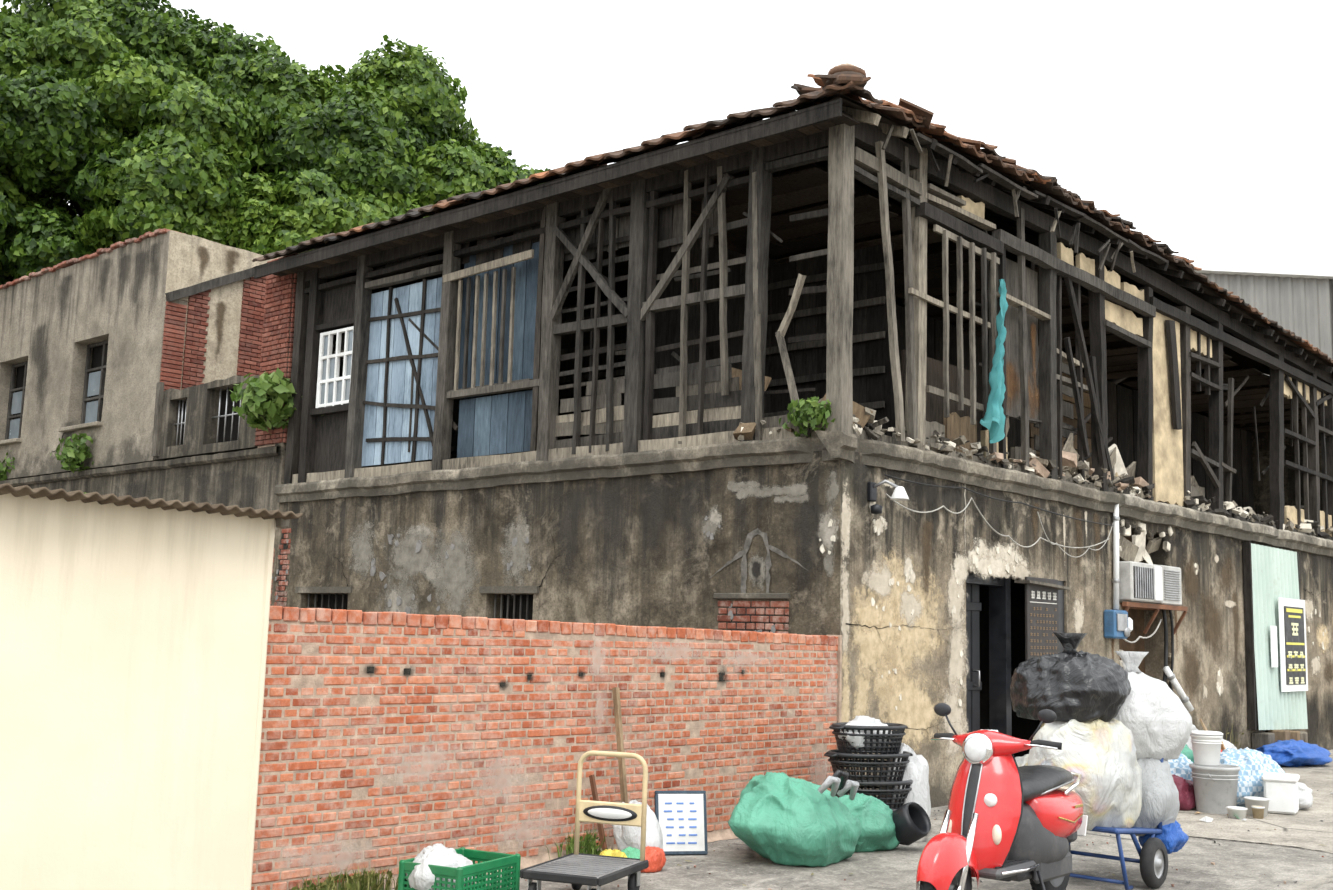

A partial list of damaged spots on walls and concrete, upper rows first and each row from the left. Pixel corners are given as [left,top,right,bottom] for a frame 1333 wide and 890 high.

leakage [101,244,158,302]
leakage [60,276,71,318]
leakage [34,325,46,392]
flaking render [727,481,808,503]
flaking render [702,506,722,540]
flaking render [717,601,789,634]
crack [846,621,941,641]
flaking render [817,471,1031,758]